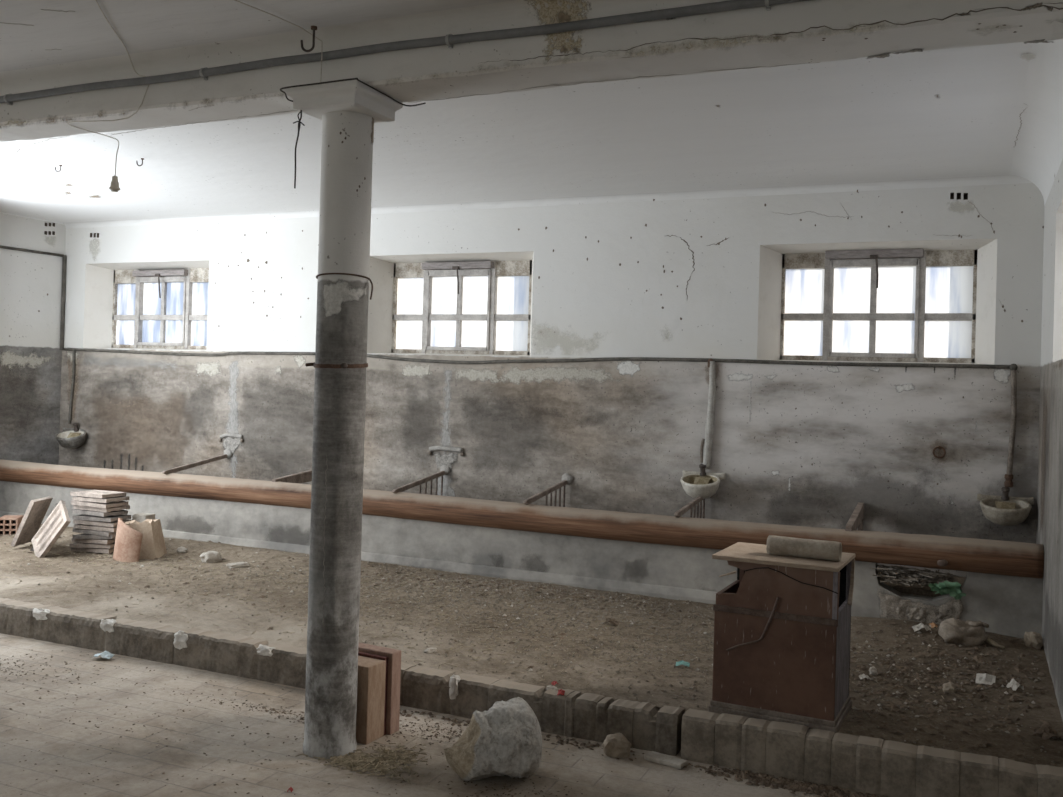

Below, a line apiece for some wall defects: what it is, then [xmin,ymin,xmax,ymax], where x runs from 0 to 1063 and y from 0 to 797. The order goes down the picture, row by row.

peeling [528,0,587,60]
crack [417,3,1063,102]
crack [667,235,728,298]
peeling [323,280,367,317]
flaking render [402,364,432,378]
flaking render [454,361,640,385]
leakage [227,361,239,434]
leakage [437,473,455,497]
spalling [878,590,963,628]